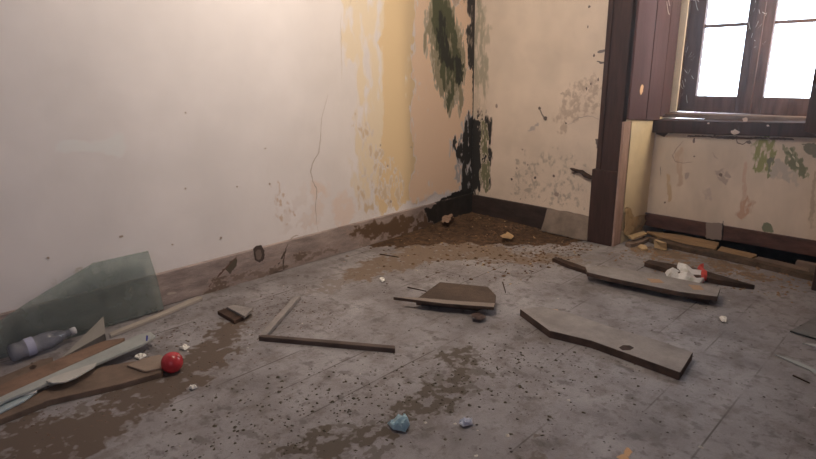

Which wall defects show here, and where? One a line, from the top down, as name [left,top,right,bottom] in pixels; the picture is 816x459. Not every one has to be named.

water stain [269,0,493,235]